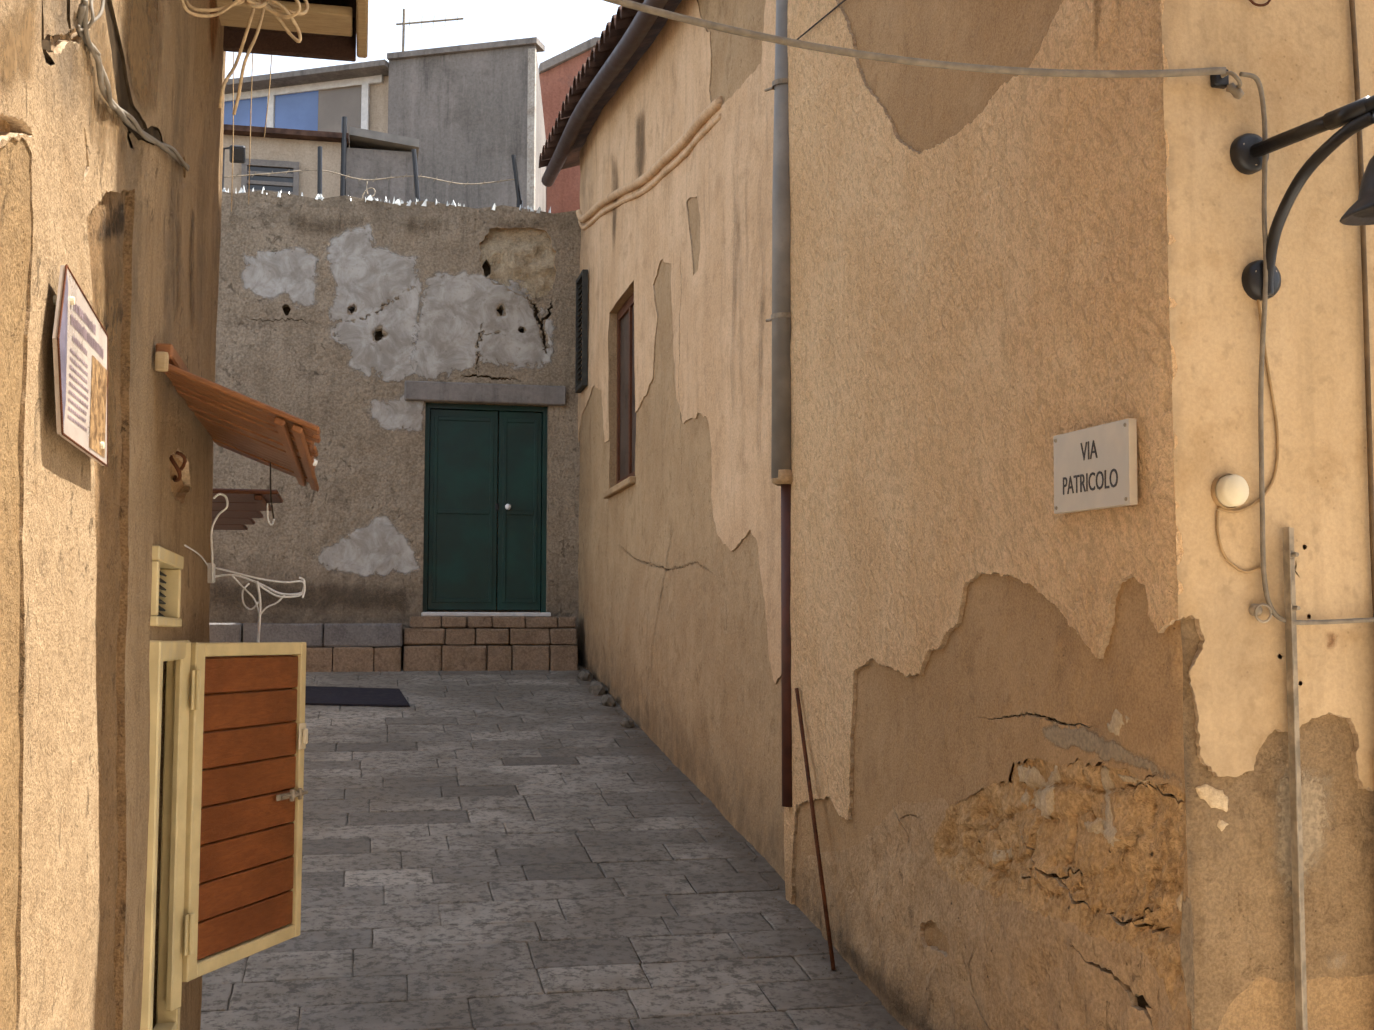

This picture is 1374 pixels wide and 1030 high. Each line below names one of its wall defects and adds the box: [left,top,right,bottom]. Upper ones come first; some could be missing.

flaking render [697,0,766,104]
flaking render [836,0,1064,154]
flaking render [686,196,700,275]
peeling [242,225,557,431]
peeling [318,516,419,576]
flaking render [578,259,1374,1030]
crack [977,712,1095,729]
crack [1014,824,1169,933]
crack [1066,943,1153,1030]